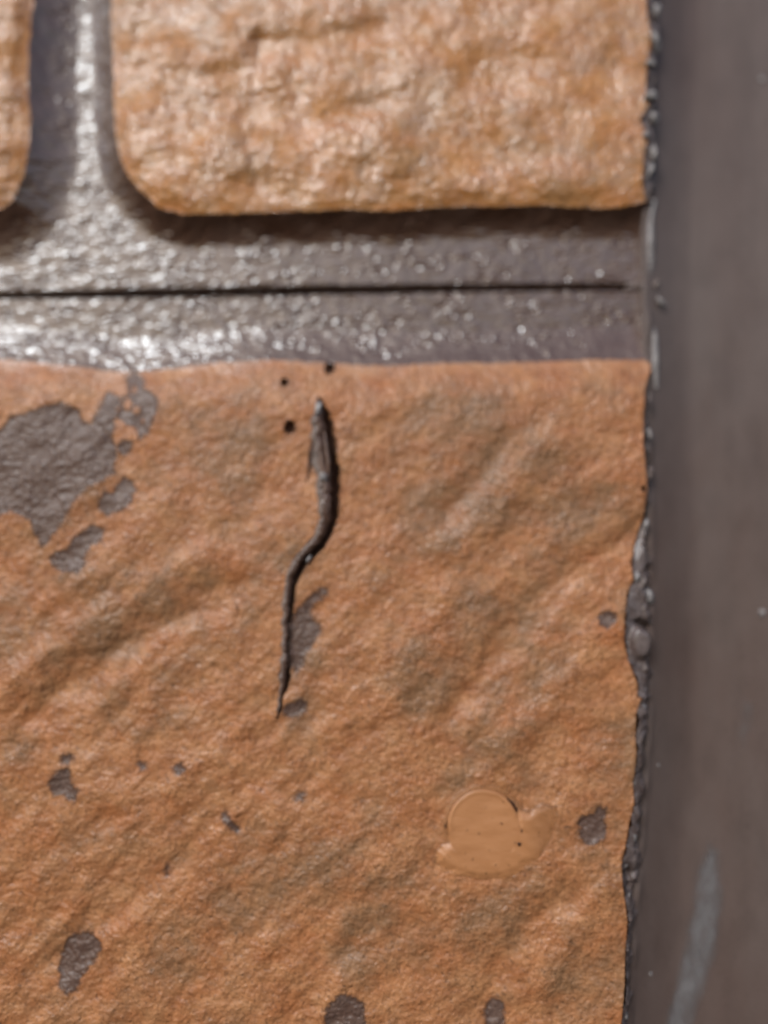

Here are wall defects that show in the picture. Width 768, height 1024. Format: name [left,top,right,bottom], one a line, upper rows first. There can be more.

peeling [0,371,158,574]
crack [276,399,341,719]
peeling [48,754,79,801]
peeling [578,806,607,845]
peeling [58,931,102,995]
peeling [324,995,366,1024]